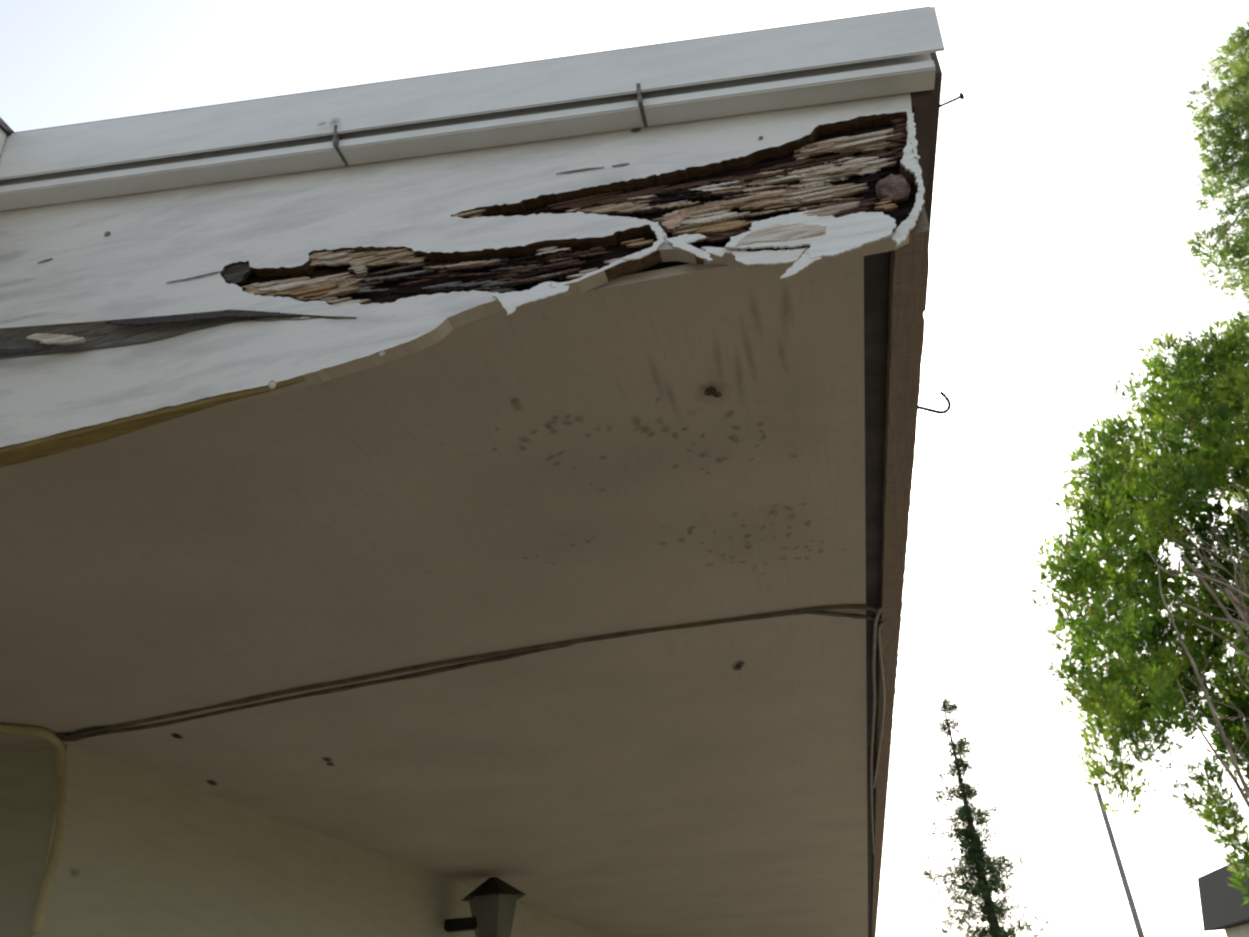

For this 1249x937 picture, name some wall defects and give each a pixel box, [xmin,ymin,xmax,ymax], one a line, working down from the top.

spalling [223,107,925,316]